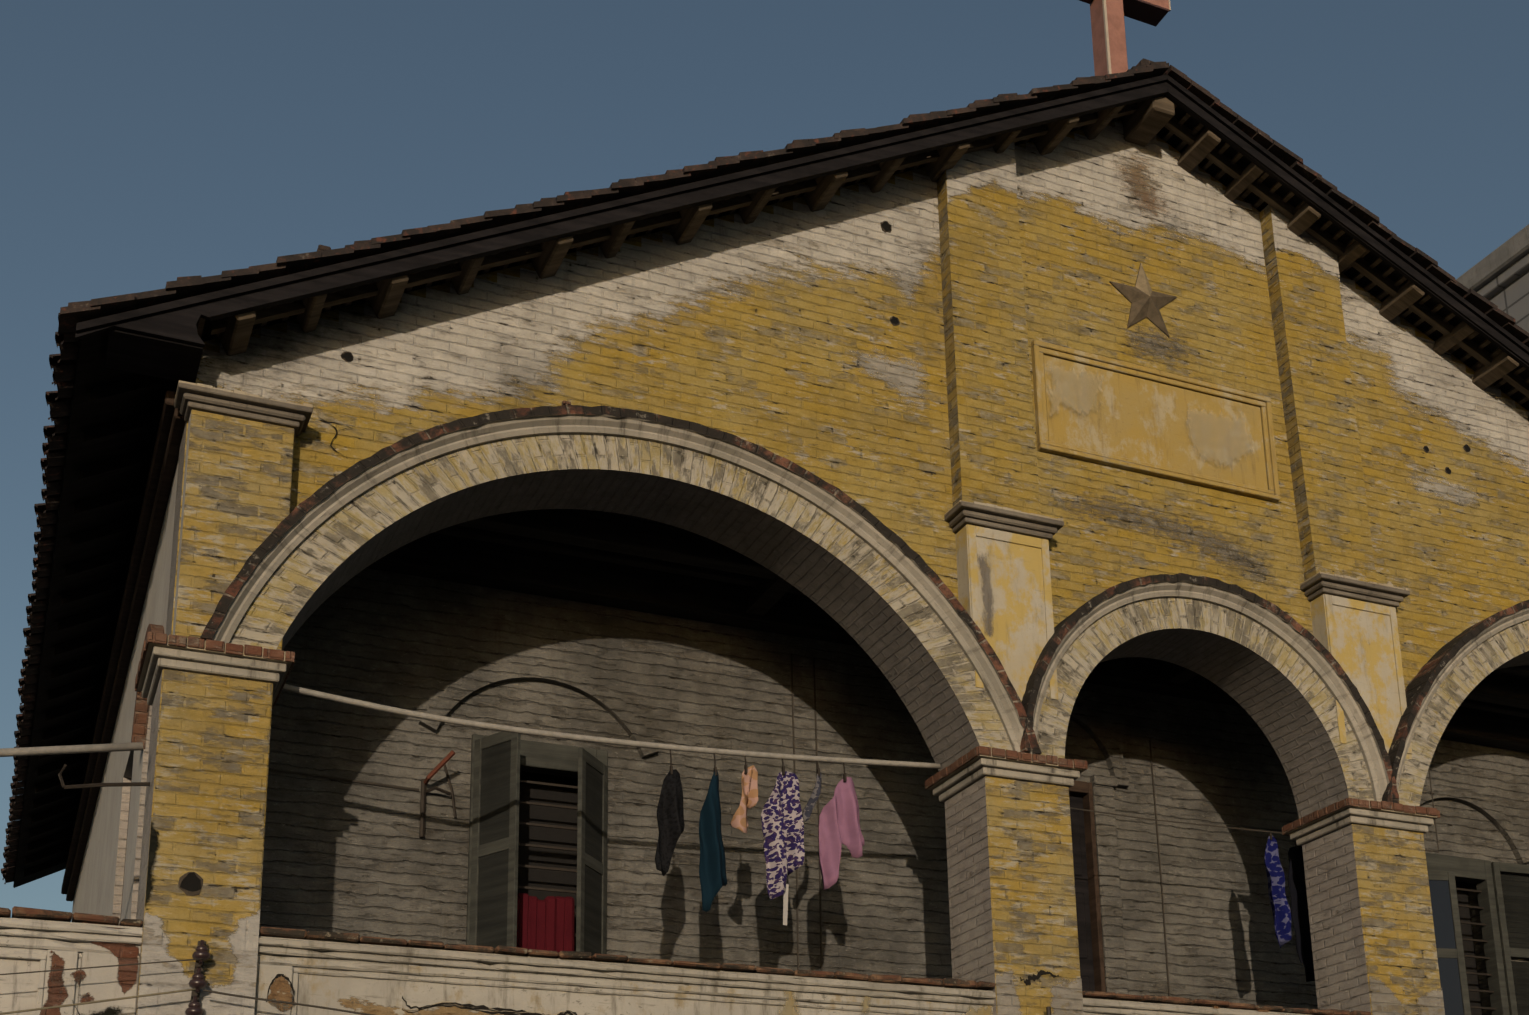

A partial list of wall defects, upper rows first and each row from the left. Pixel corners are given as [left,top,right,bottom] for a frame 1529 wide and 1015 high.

peeling [197,122,1529,476]
peeling [1412,476,1478,505]
spalling [40,951,94,1015]
peeling [82,910,296,1015]
spalling [338,996,575,1015]
crack [402,996,577,1015]